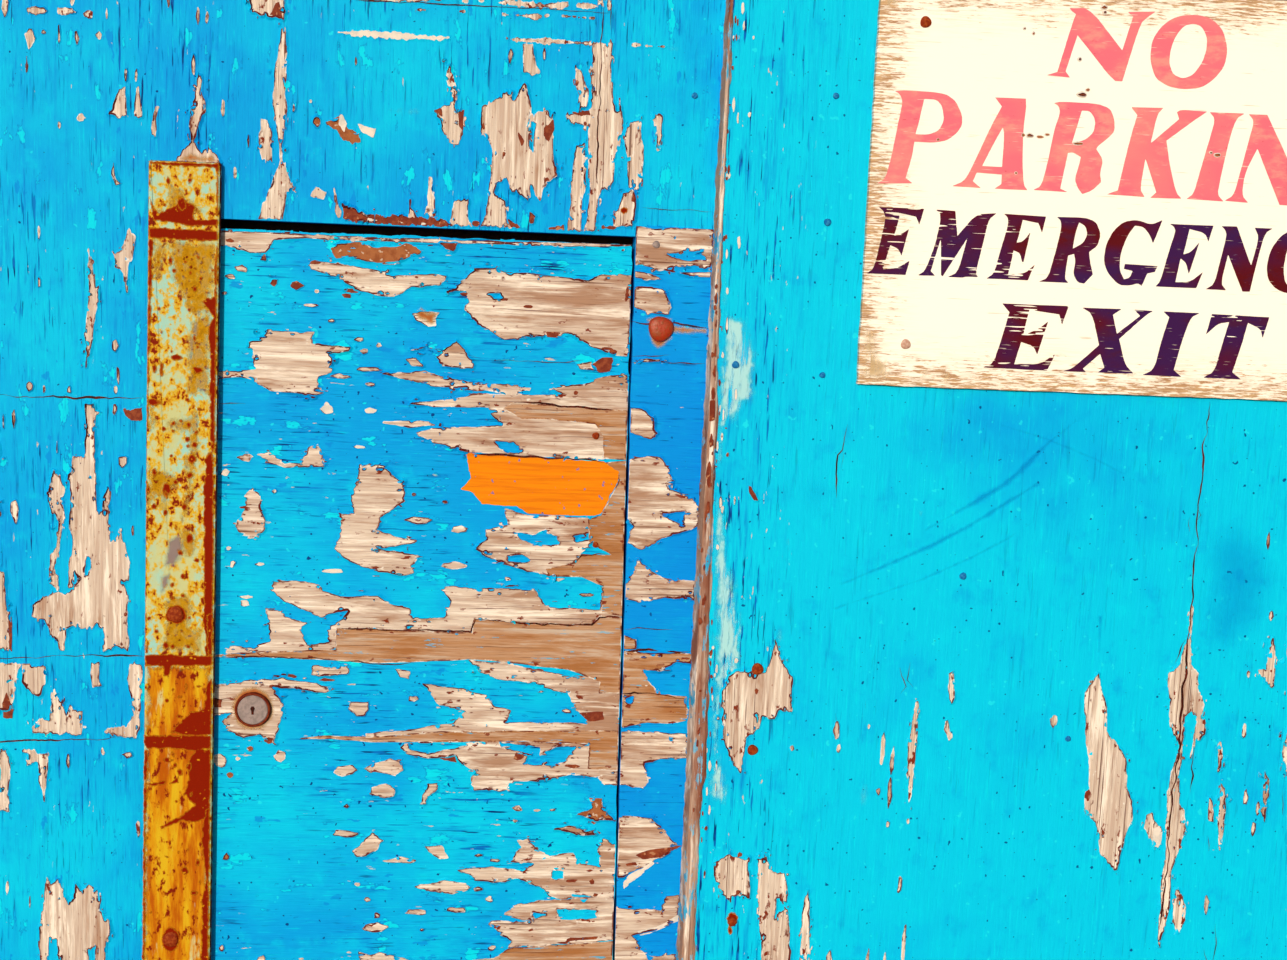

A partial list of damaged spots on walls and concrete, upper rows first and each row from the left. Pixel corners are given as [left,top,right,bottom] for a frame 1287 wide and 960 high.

peeling [24,0,109,73]
peeling [111,226,137,295]
peeling [174,53,237,179]
peeling [219,0,760,626]
peeling [0,247,144,814]
peeling [28,875,116,960]
rust [142,161,219,960]
peeling [214,444,621,779]
peeling [332,633,796,960]
peeling [702,850,833,960]
peeling [1082,603,1287,953]
crack [1160,402,1210,924]